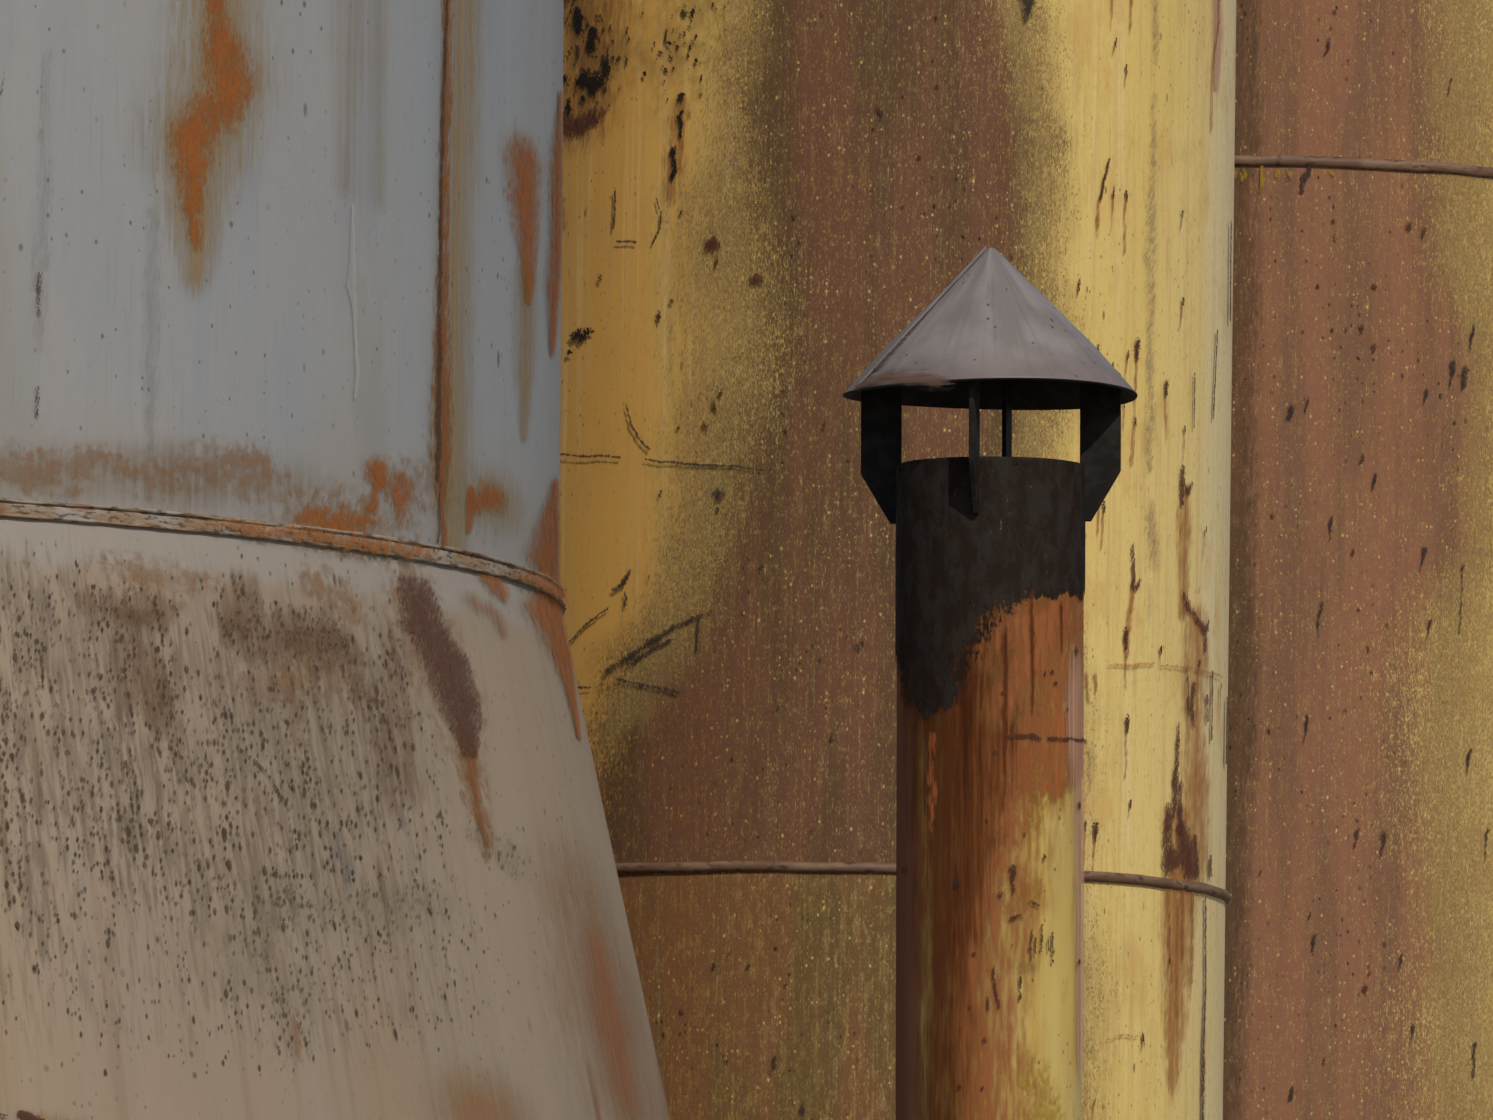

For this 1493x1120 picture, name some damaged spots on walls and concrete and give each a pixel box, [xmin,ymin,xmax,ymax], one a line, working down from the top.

corrosion [165,0,261,286]
corrosion [209,0,509,855]
corrosion [481,476,582,739]
corrosion [504,91,594,440]
corrosion [895,537,1099,1120]
corrosion [1097,93,1222,1098]